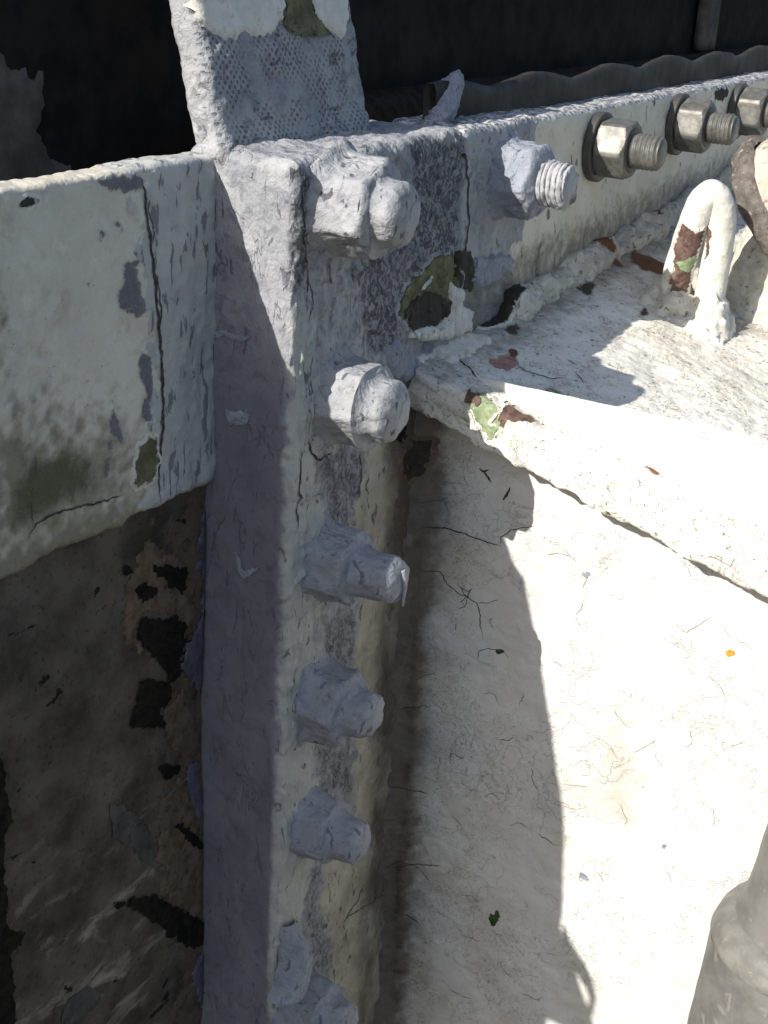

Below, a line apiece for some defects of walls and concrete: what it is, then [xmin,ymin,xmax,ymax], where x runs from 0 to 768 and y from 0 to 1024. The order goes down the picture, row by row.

peeling [396,245,530,374]
crack [142,181,165,503]
peeling [130,432,162,492]
crack [479,468,510,500]
crack [29,495,122,536]
peeling [135,563,189,603]
crack [419,527,529,546]
crack [680,555,735,574]
crack [418,567,509,659]
peeling [131,614,187,729]
peeling [175,822,204,849]
peeling [114,894,204,950]